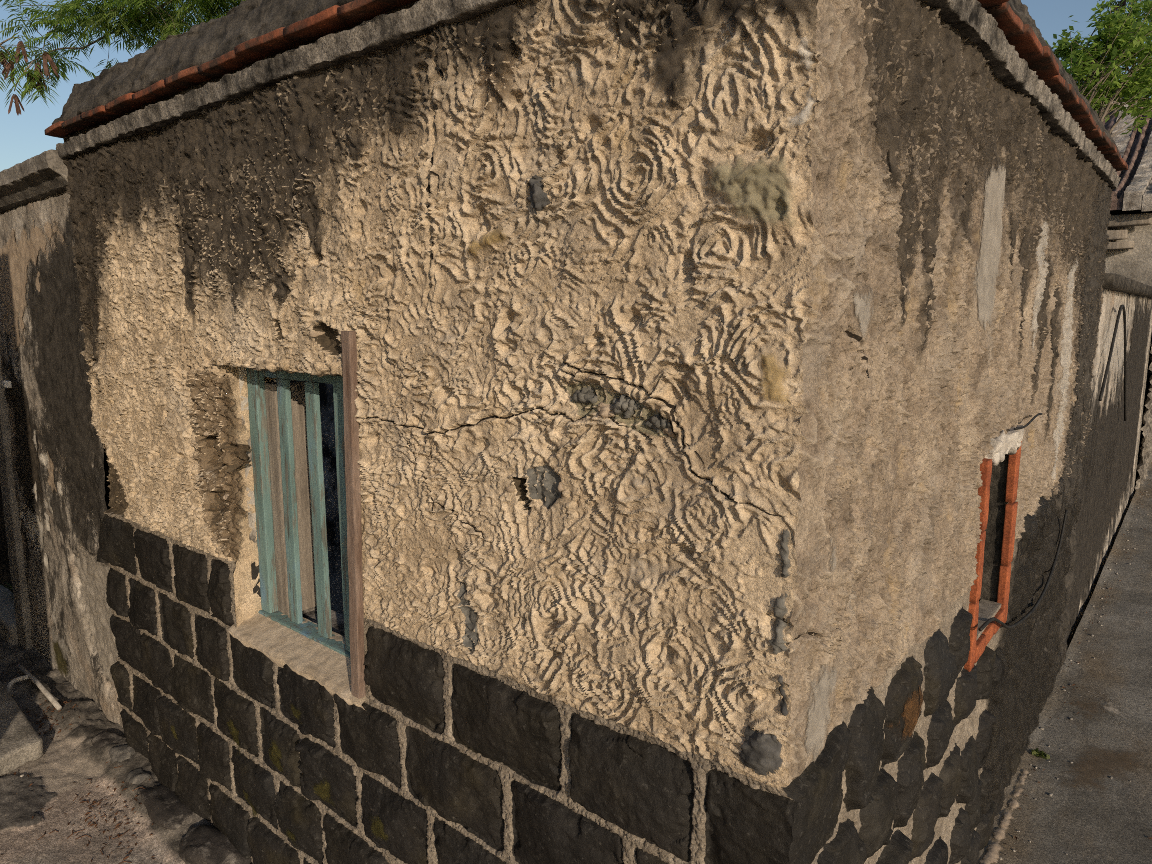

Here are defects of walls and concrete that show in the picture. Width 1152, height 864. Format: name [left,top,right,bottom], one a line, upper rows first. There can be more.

leakage [2,36,417,549]
spalling [103,444,128,517]
spalling [527,465,563,509]
crack [361,361,782,543]
spalling [563,382,677,440]
leakage [858,0,1151,808]